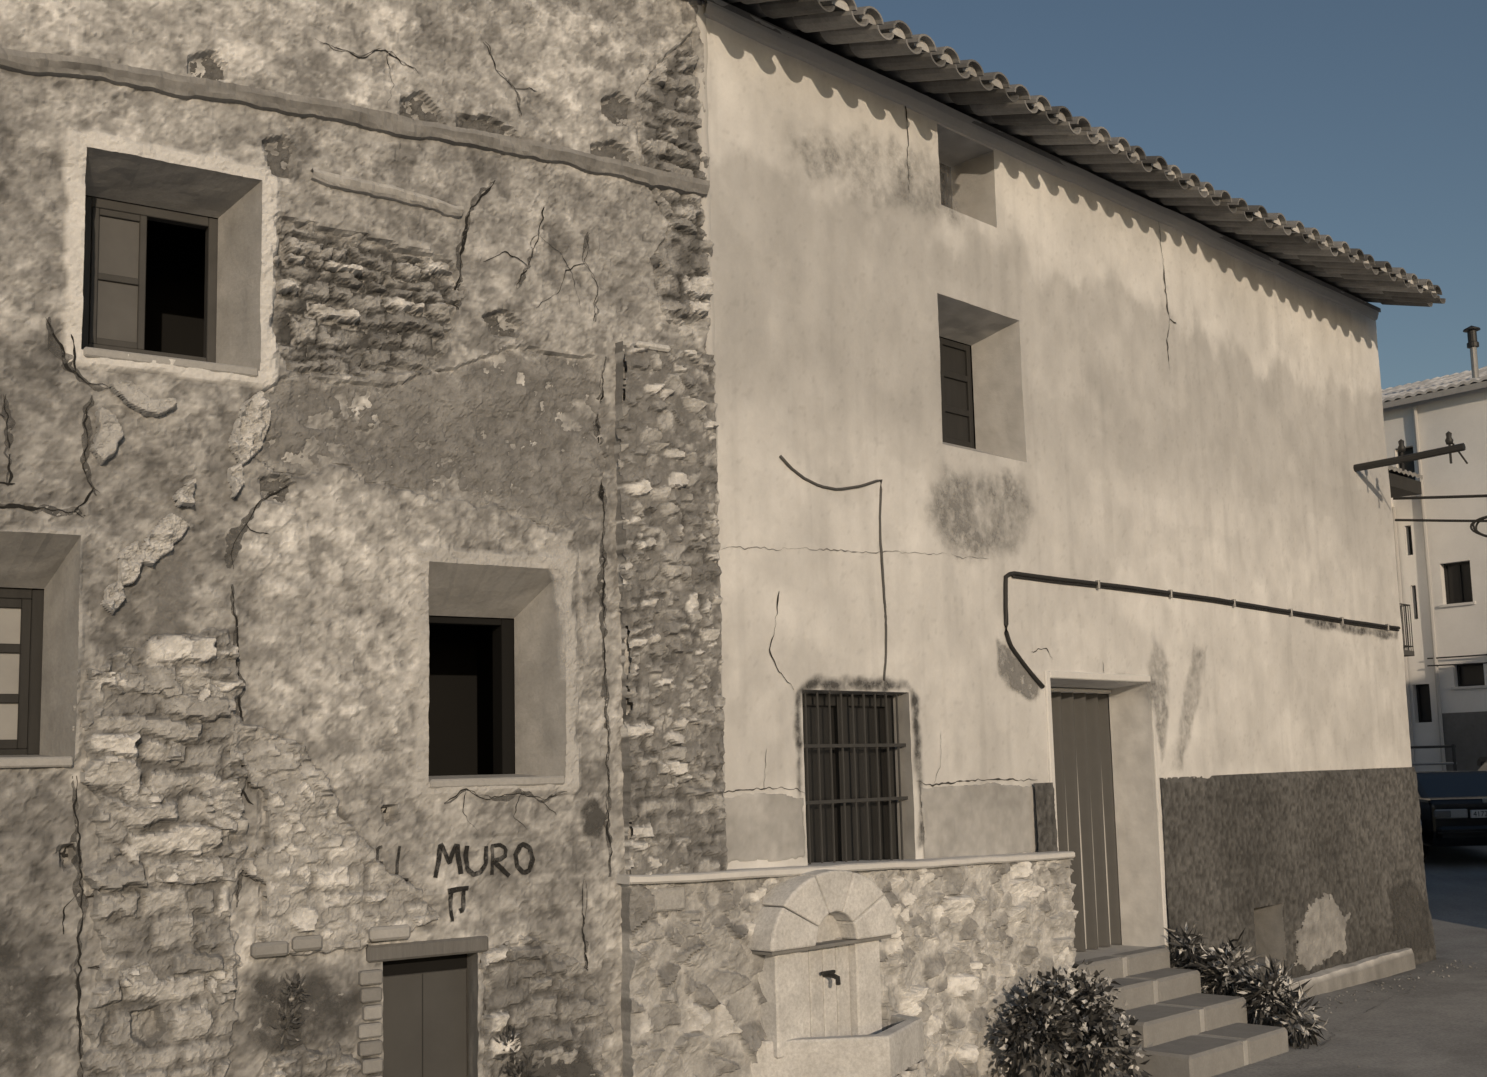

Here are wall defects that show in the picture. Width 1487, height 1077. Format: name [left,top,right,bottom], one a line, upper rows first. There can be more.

crack [453,180,600,322]
crack [1159,226,1177,360]
crack [0,317,107,518]
peeling [90,380,177,466]
peeling [255,216,607,532]
damp [936,478,1023,553]
crack [581,357,613,971]
flaking render [86,668,439,956]
crack [444,788,567,830]
crack [62,776,99,1077]
flaking render [260,1042,369,1077]
flaking render [477,934,614,1077]